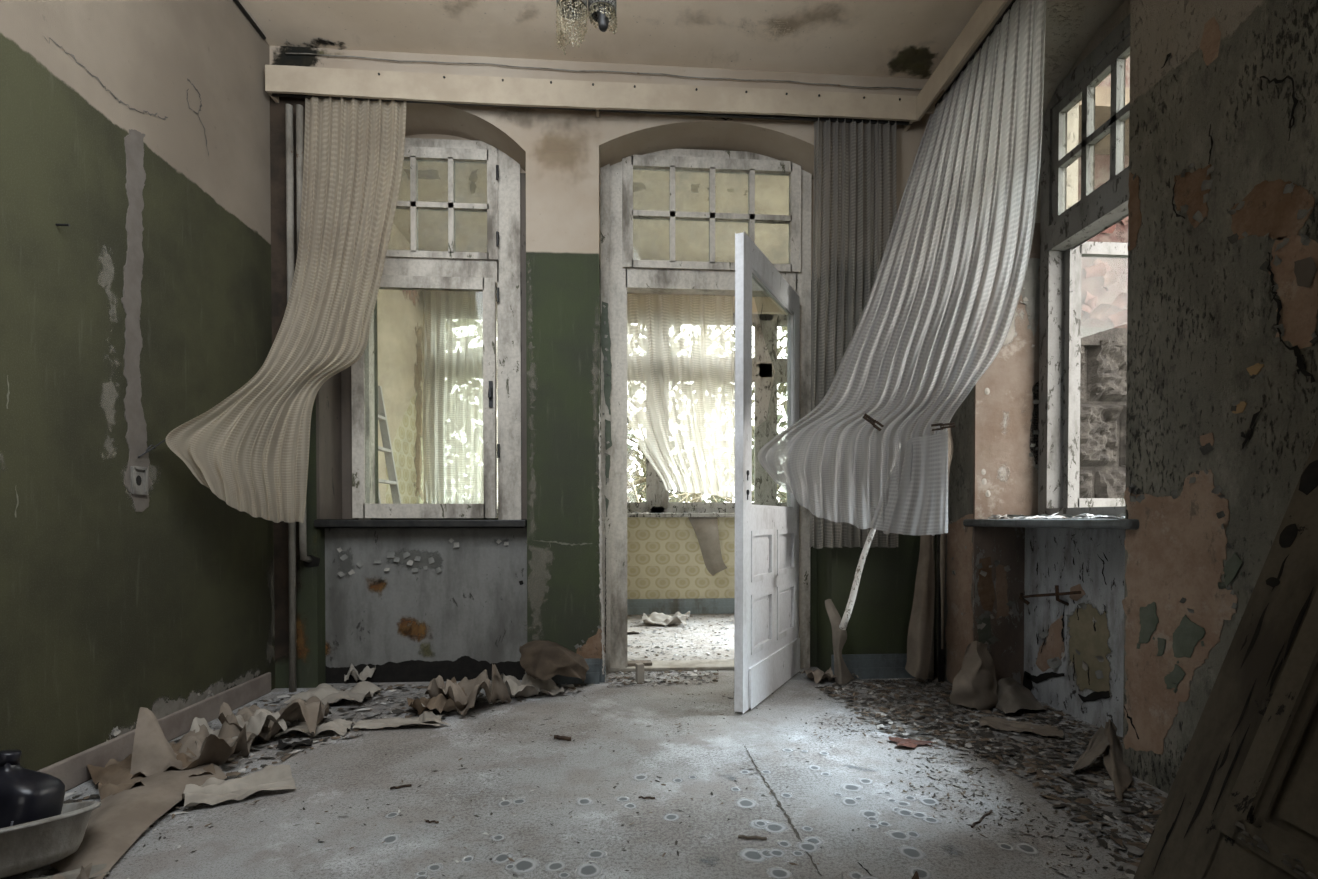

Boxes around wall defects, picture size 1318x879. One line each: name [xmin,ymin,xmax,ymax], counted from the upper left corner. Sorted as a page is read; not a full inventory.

peeling [99,246,117,318]
peeling [1020,258,1040,347]
spalling [1259,234,1318,349]
peeling [101,381,119,458]
peeling [1029,381,1041,469]
rust [397,617,434,656]
spalling [945,433,1238,754]